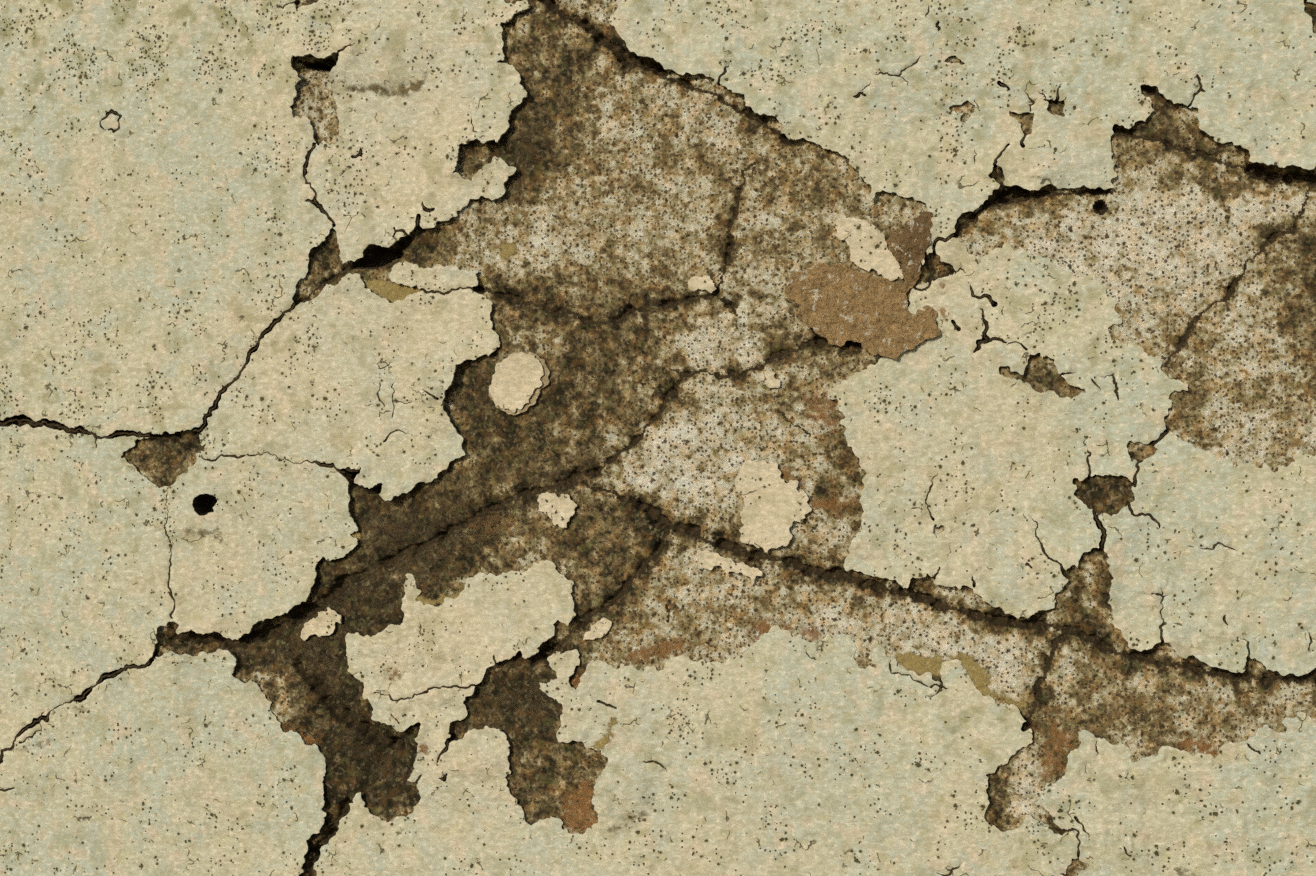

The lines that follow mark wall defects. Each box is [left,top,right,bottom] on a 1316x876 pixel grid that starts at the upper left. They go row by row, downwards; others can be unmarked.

crack [303,143,362,227]
crack [421,162,756,325]
peeling [786,211,953,360]
peeling [954,85,1316,470]
crack [0,265,361,477]
crack [0,337,1316,792]
peeling [697,548,763,581]
peeling [735,460,812,553]
peeling [1072,474,1135,516]
peeling [450,651,608,834]
crack [307,798,353,876]
crack [1059,816,1090,876]